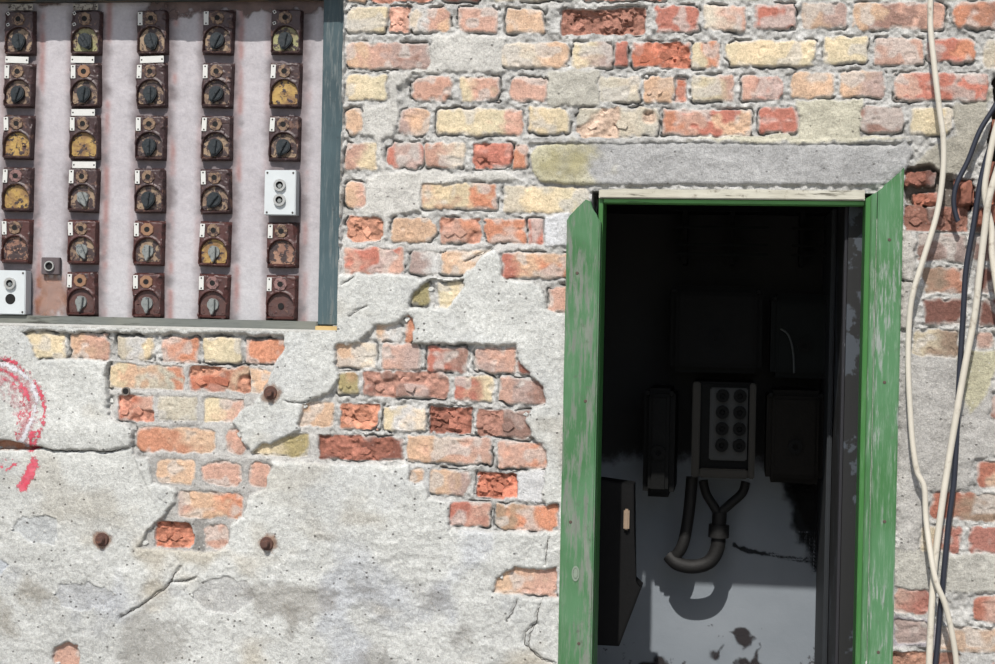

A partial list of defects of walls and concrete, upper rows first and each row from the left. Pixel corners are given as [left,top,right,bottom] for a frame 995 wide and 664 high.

spalling [371,0,435,34]
spalling [561,0,691,139]
spalling [473,144,514,170]
spalling [904,170,969,233]
spalling [346,216,385,243]
spalling [440,217,483,245]
flaking render [25,278,560,553]
crack [39,445,132,453]
crack [123,572,194,616]
flaking render [493,567,558,600]
flaking render [52,642,80,664]
spalling [893,651,960,664]